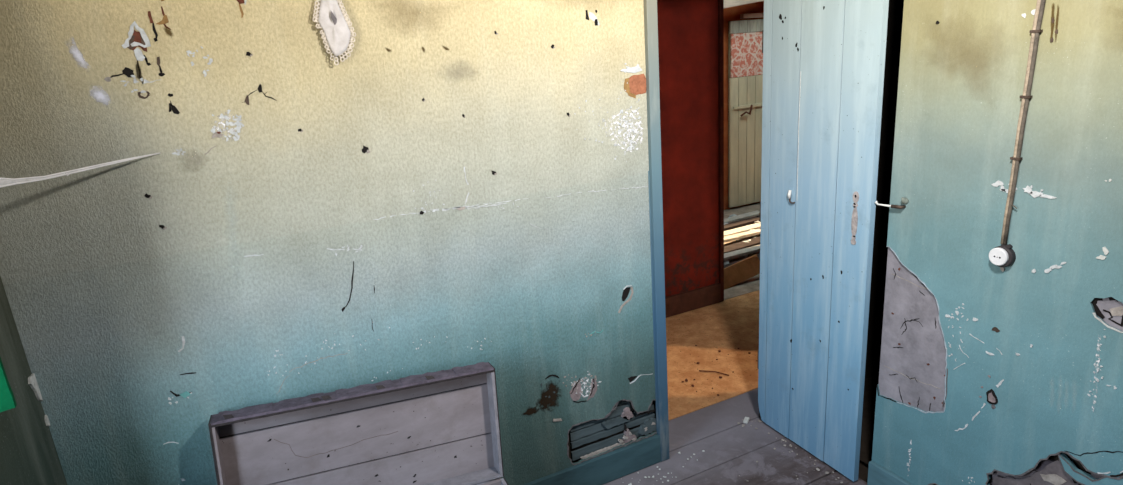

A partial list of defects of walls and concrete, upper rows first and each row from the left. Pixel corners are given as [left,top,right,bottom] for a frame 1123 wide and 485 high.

peeling [71,48,87,66]
spalling [93,0,172,103]
spalling [567,63,646,162]
peeling [991,180,1057,199]
spalling [618,285,634,313]
flaking render [877,246,1033,413]
spalling [1092,297,1123,333]
flaking render [523,371,657,465]
peeling [955,375,1004,431]
flaking render [962,451,1123,485]